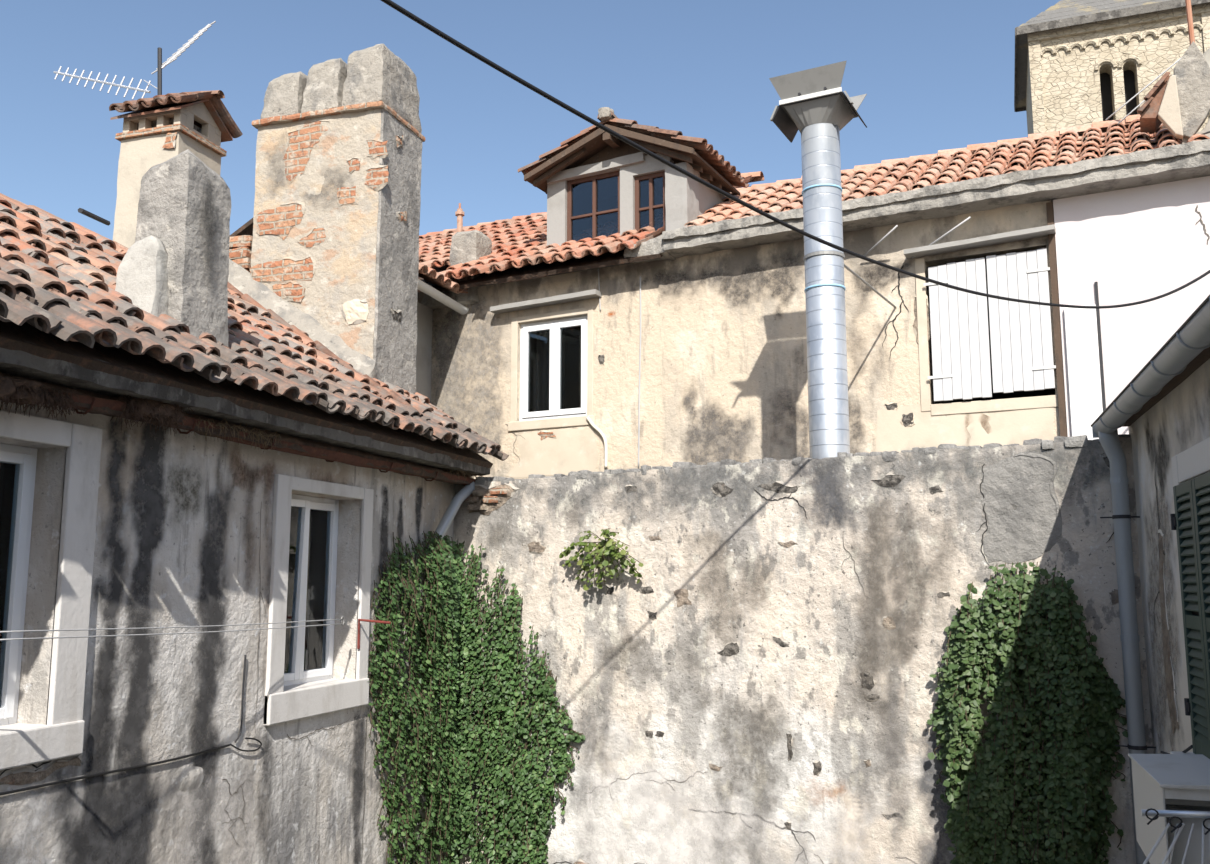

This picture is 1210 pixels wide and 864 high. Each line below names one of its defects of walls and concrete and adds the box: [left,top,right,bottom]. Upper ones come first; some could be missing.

flaking render [283,120,332,185]
flaking render [337,135,404,207]
flaking render [249,201,327,303]
water stain [643,254,799,315]
crack [882,272,909,360]
crack [1195,205,1210,245]
water stain [684,394,749,465]
water stain [849,404,862,453]
crack [979,464,990,566]
spalling [981,451,1062,563]
water stain [0,419,271,864]
crack [585,770,824,864]